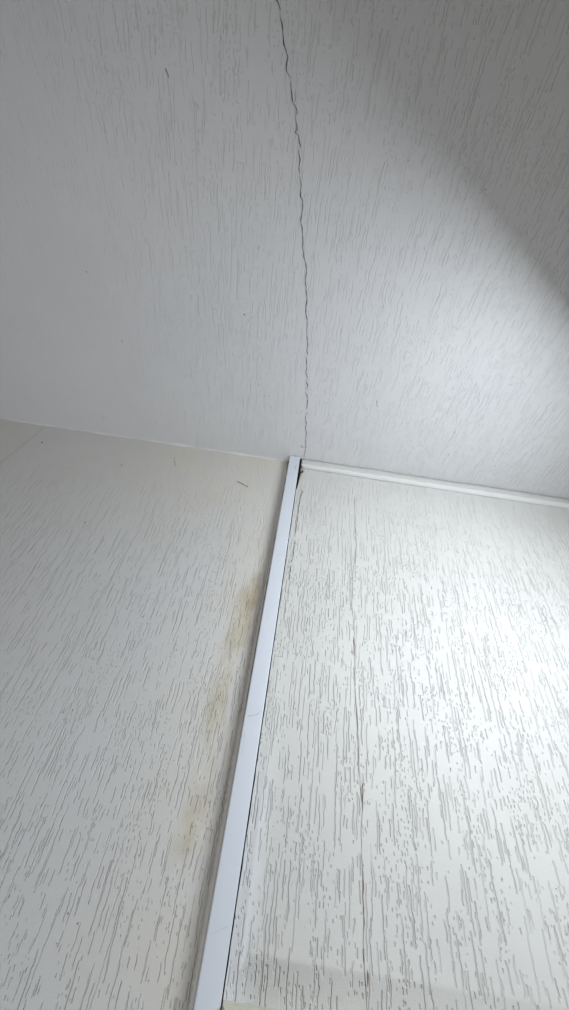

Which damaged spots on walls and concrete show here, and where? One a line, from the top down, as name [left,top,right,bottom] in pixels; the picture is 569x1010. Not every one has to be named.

crack [243,0,308,719]